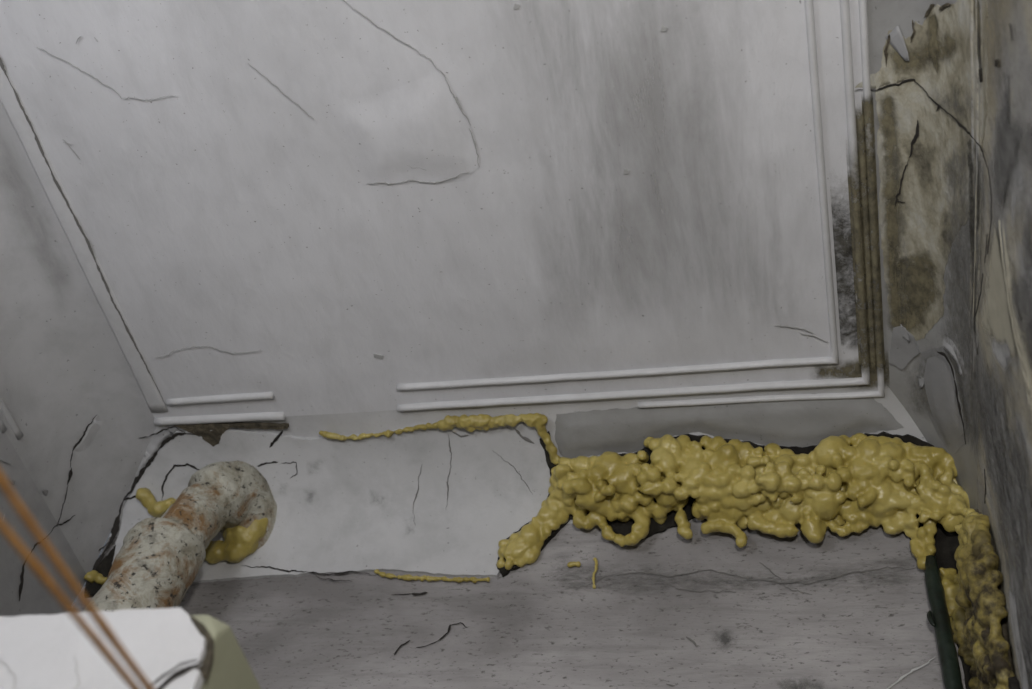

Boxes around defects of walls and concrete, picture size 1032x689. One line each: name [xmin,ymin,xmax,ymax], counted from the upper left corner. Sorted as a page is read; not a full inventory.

damp [891,14,956,72]
damp [974,0,982,73]
peeling [875,0,1001,370]
damp [818,96,937,387]
crack [855,71,1032,418]
crack [0,58,259,601]
flaking render [174,422,289,446]
crack [937,337,967,445]
damp [948,81,1032,689]
flaking render [642,496,707,540]
flaking render [916,514,960,574]
crack [151,659,203,689]